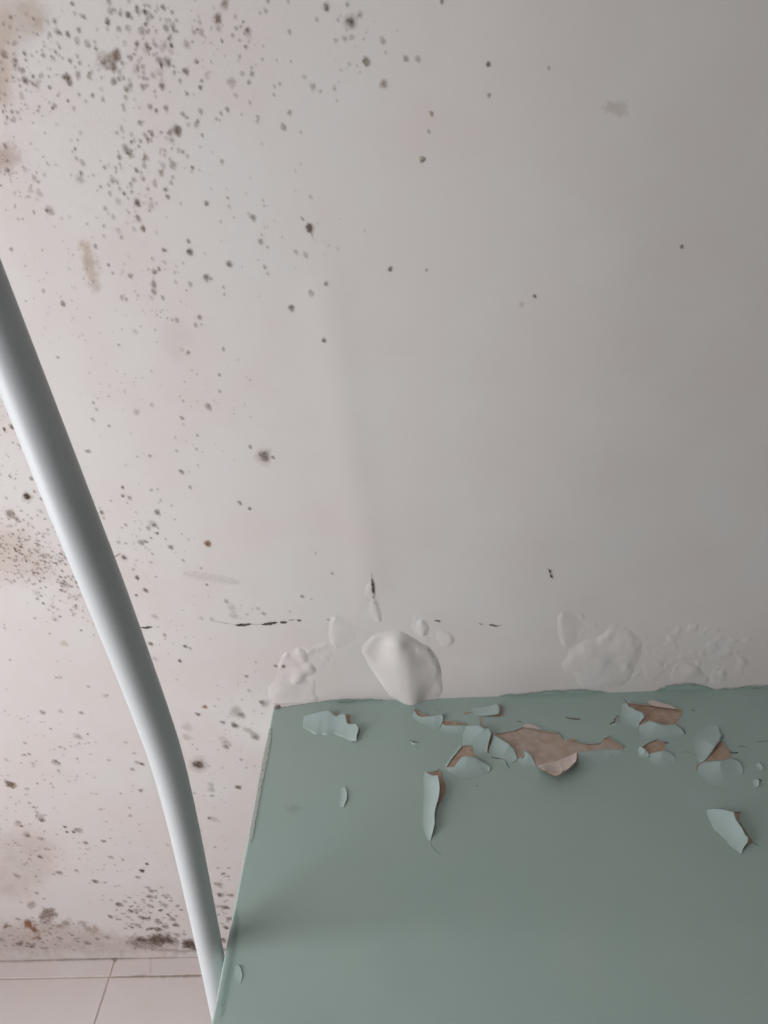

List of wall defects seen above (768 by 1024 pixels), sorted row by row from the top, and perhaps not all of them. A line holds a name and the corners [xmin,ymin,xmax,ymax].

peeling [303,709,360,741]
peeling [413,699,763,841]
peeling [707,809,757,853]
damp [132,917,196,950]